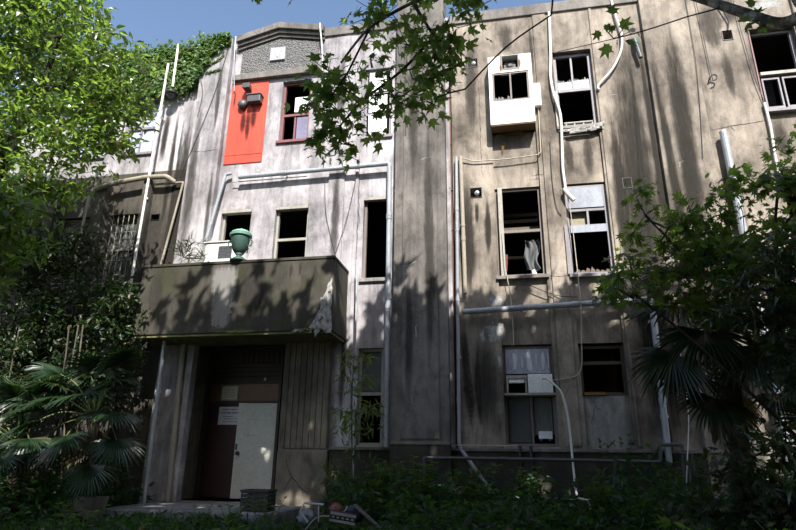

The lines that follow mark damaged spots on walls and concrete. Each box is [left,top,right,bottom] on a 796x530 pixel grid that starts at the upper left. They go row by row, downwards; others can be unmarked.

damp [699,9,731,45]
damp [724,59,734,92]
damp [241,99,256,137]
damp [410,51,418,162]
damp [160,117,199,264]
damp [204,179,212,237]
damp [425,169,434,337]
damp [611,47,703,415]
damp [211,267,236,328]
spalling [291,278,333,337]